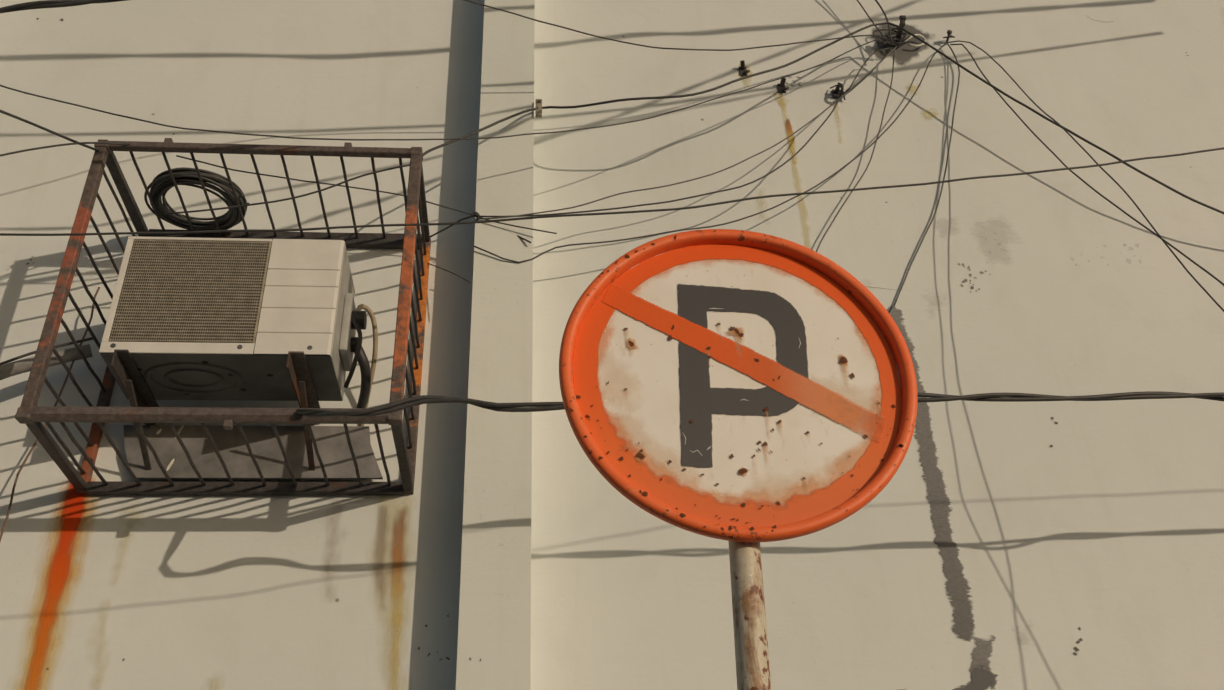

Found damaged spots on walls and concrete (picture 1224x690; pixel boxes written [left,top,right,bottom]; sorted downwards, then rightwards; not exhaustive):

rust [786,119,796,163]
rust [22,473,89,690]